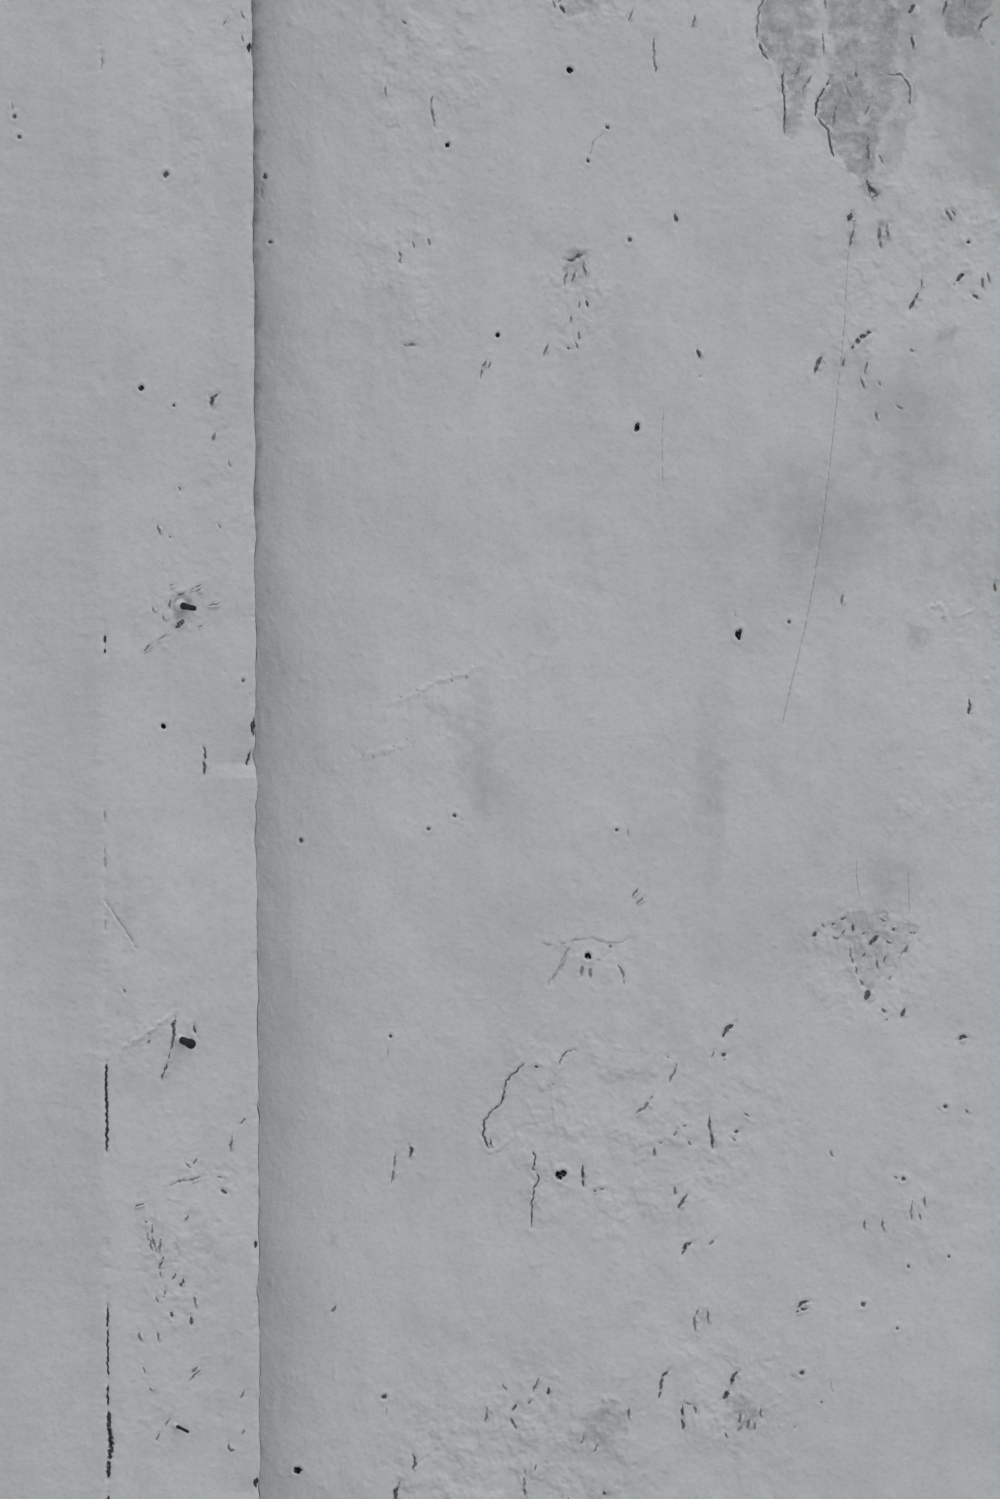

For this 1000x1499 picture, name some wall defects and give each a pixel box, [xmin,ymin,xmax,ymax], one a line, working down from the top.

peeling [756,0,768,59]
peeling [781,67,857,157]
peeling [866,177,881,201]
crack [482,1050,575,1148]
crack [531,1151,543,1227]